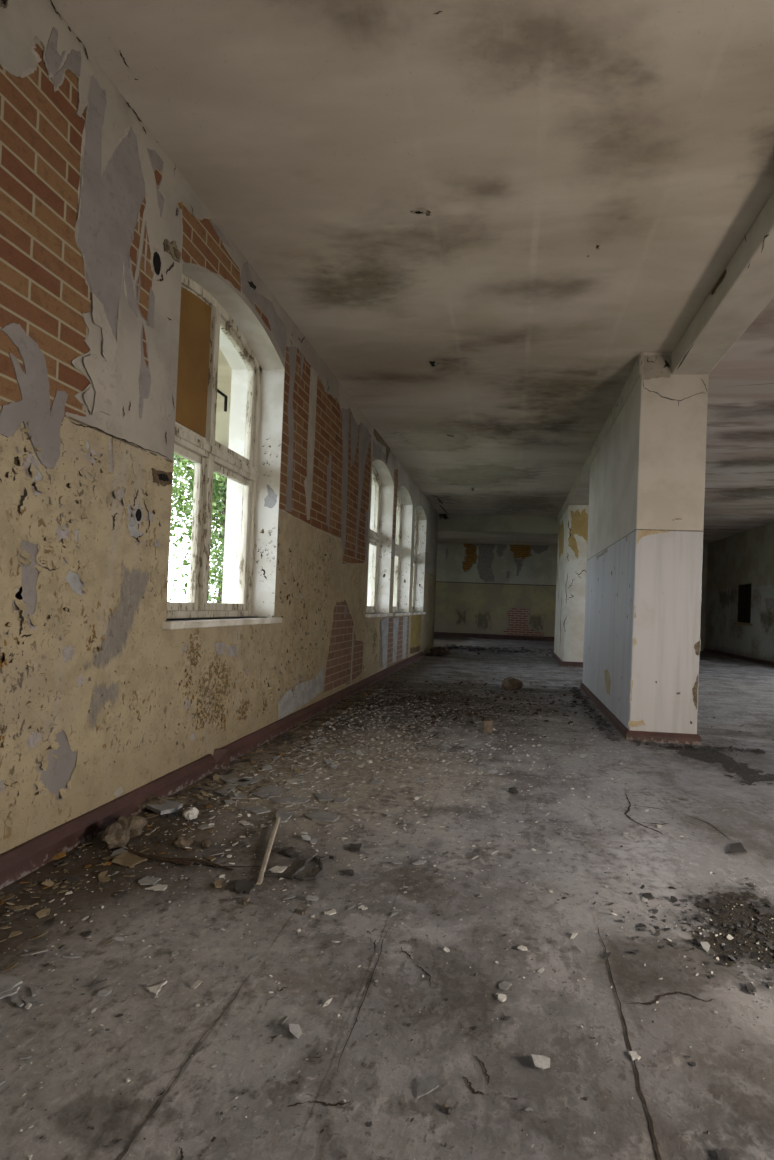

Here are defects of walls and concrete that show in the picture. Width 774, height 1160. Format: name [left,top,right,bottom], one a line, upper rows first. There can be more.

spalling [149,239,181,283]
crack [643,345,774,406]
peeling [0,422,50,495]
peeling [4,440,104,676]
peeling [110,467,173,573]
peeling [559,509,588,559]
peeling [0,701,96,801]
leakage [663,744,774,785]
crack [118,975,249,1160]
crack [288,1100,349,1108]
crack [597,925,715,1160]